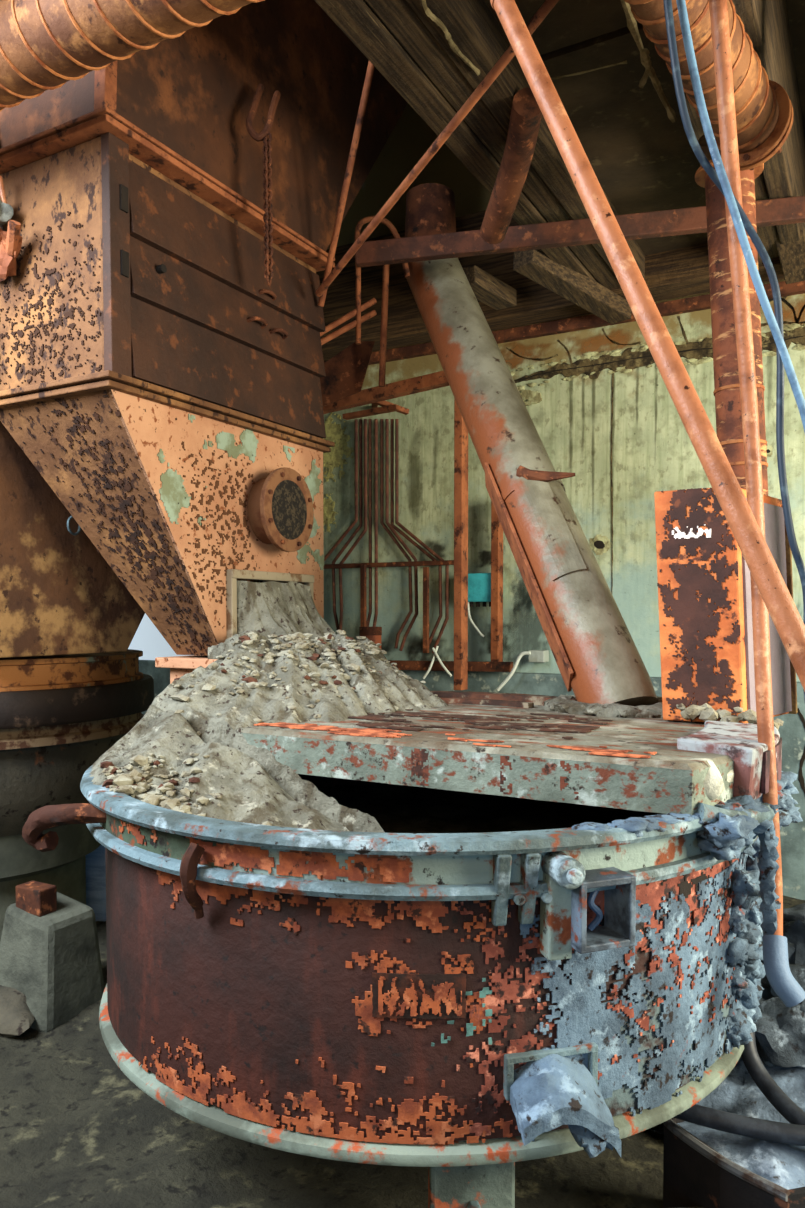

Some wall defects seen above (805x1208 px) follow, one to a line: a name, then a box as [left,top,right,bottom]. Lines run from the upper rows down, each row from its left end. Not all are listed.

corrosion [773,301,805,324]
corrosion [580,330,629,353]
corrosion [501,342,549,368]
leakage [570,373,595,484]
leakage [487,581,547,666]
leakage [408,637,442,661]